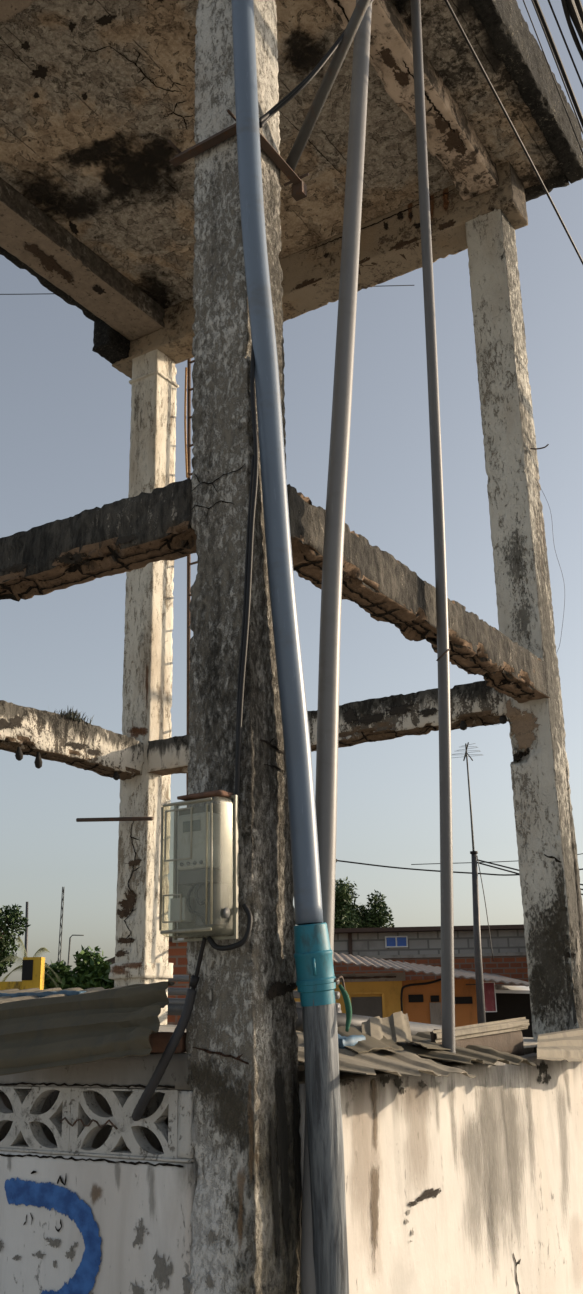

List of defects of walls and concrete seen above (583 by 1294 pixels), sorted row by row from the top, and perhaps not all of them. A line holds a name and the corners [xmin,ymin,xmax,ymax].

water stain [286,27,329,76]
spalling [375,47,410,86]
spalling [435,117,468,157]
water stain [12,133,181,220]
crack [192,464,245,519]
spalling [0,534,189,598]
spalling [293,555,322,584]
spalling [338,566,541,762]
spalling [0,715,121,777]
crack [124,821,141,944]
water stain [525,858,578,1032]
peeling [405,1188,441,1242]